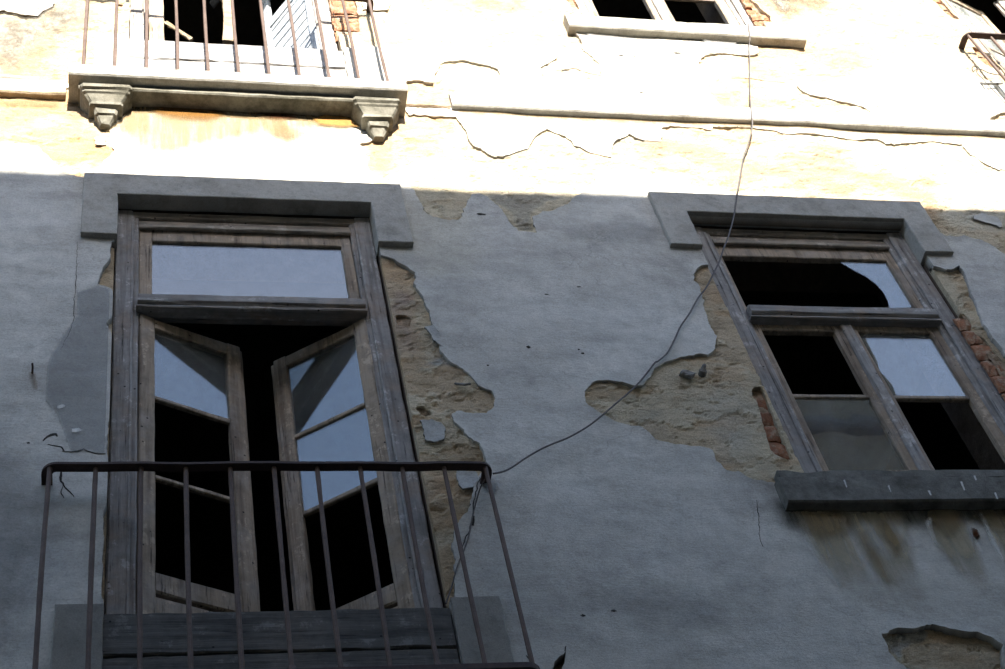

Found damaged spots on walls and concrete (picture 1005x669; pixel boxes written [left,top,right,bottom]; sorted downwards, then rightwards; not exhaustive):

peeling [0,0,130,177]
peeling [328,0,601,88]
peeling [698,0,1005,114]
peeling [361,112,1005,254]
peeling [380,256,494,608]
peeling [585,267,804,483]
peeling [929,269,1005,401]
spalling [884,630,1002,669]